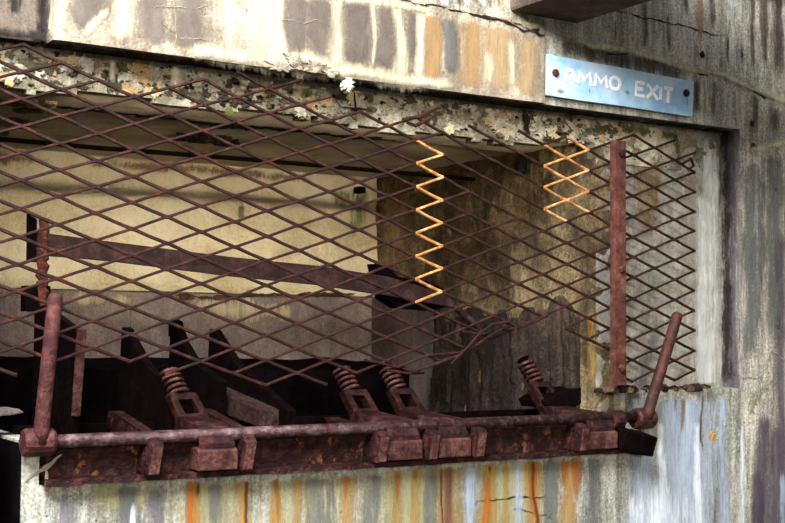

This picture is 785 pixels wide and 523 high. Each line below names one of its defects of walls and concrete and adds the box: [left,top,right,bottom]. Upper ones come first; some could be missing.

crack [402,0,546,39]
crack [619,11,731,36]
spalling [0,43,627,149]
leakage [743,157,785,523]
rust [187,482,248,523]
rust [271,477,355,523]
rust [372,470,425,523]
rust [437,468,458,523]
rust [480,462,541,523]
rust [560,458,580,523]